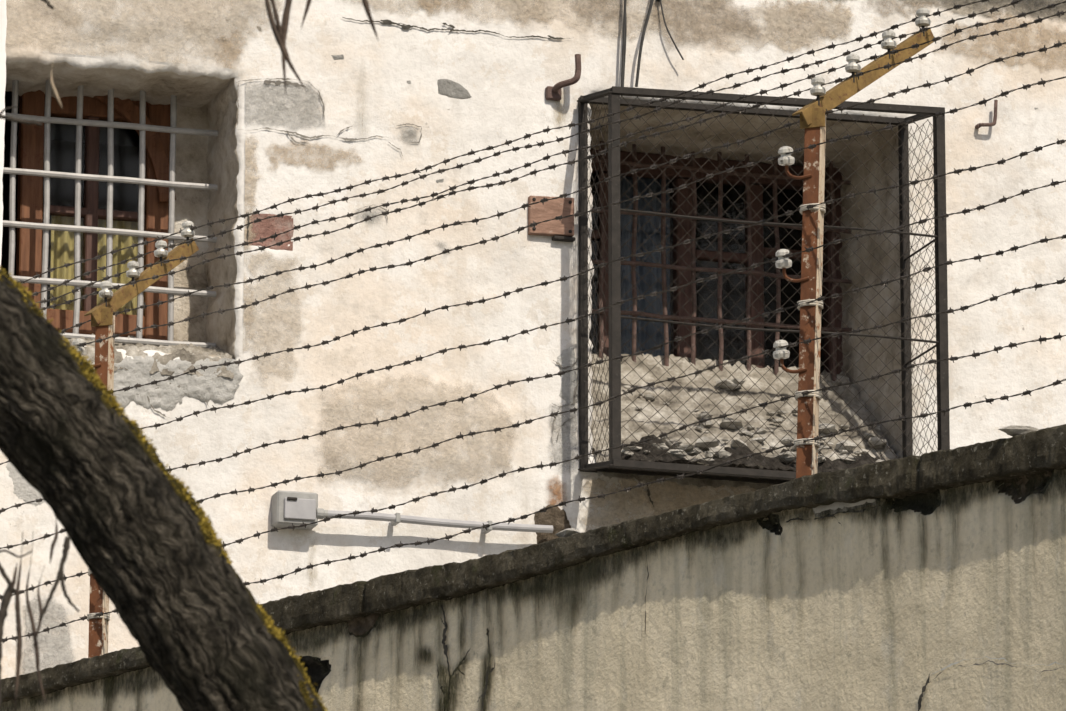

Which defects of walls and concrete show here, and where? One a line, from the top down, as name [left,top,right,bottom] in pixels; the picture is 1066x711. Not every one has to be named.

crack [343,17,574,40]
crack [236,78,422,156]
spalling [114,356,243,412]
water stain [284,469,1066,711]
water stain [0,667,163,711]
crack [437,605,495,709]
crack [918,656,1065,711]